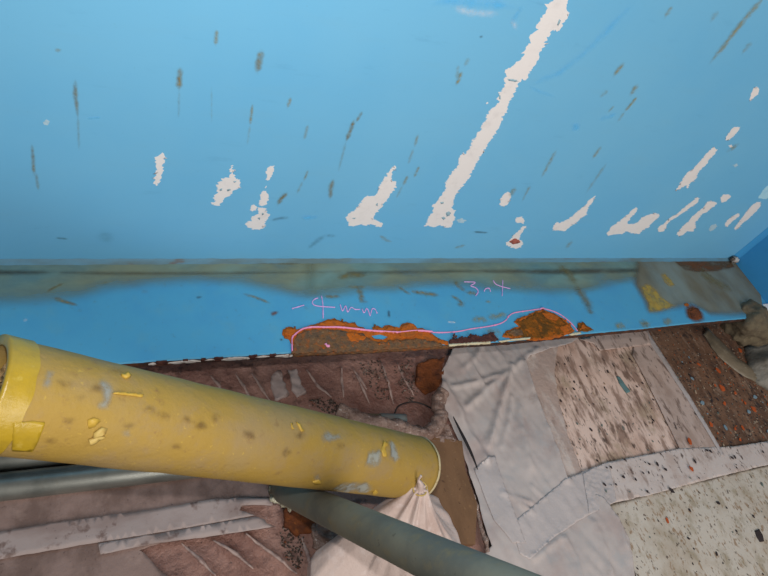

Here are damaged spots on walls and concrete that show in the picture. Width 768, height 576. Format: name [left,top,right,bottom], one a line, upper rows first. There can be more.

peeling [424,0,569,228]
peeling [153,153,167,186]
peeling [211,165,241,206]
peeling [245,166,274,230]
peeling [345,166,397,227]
peeling [552,196,595,231]
peeling [607,194,731,236]
peeling [675,147,718,191]
peeling [709,186,768,231]
water stain [0,261,762,314]
corrosion [282,309,593,357]
corrosion [684,303,703,321]